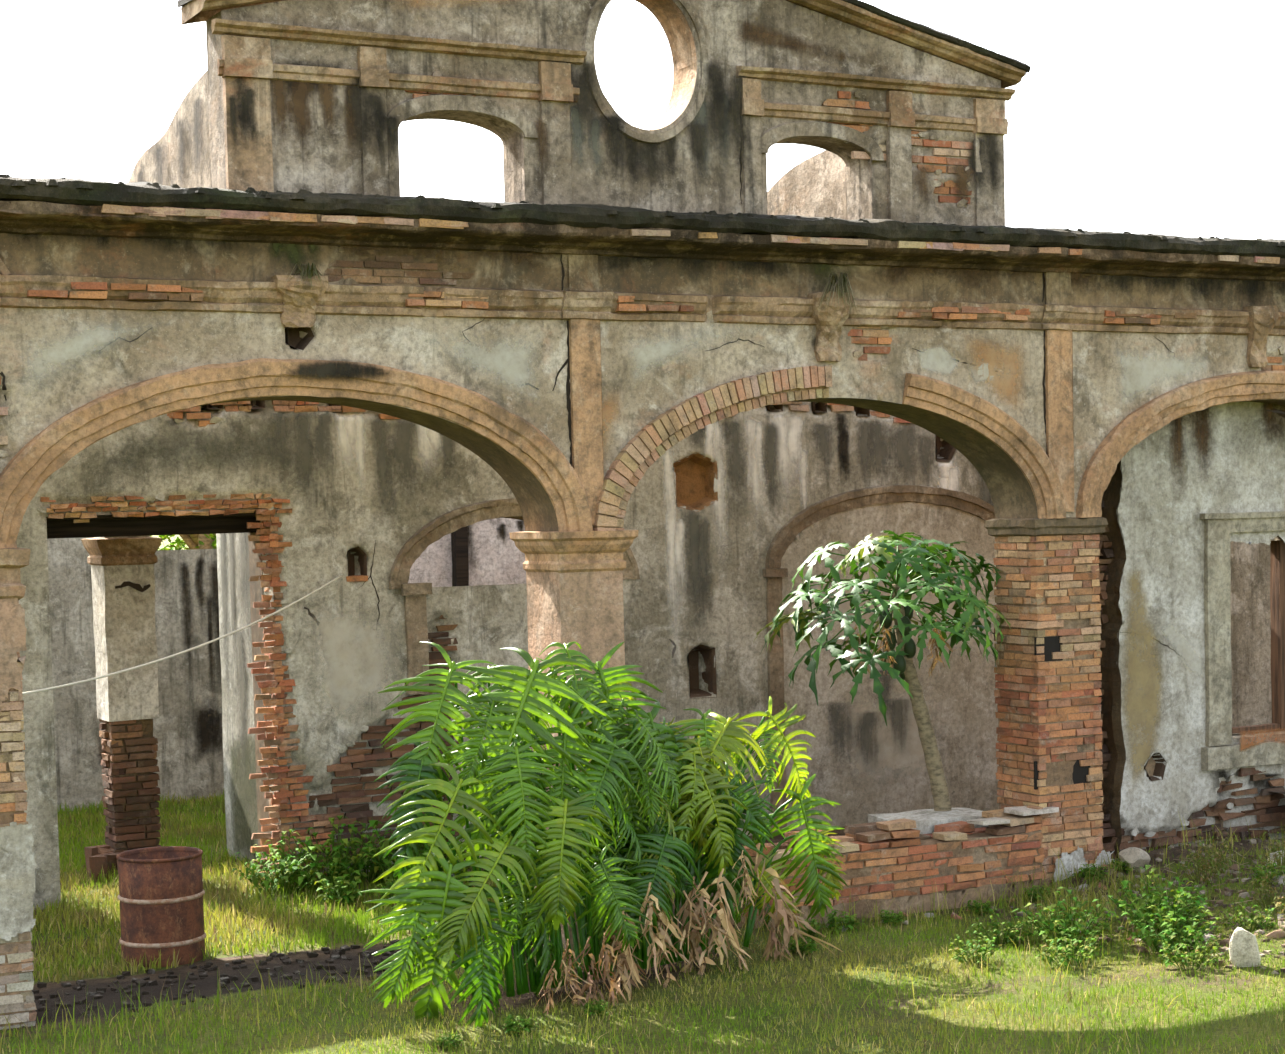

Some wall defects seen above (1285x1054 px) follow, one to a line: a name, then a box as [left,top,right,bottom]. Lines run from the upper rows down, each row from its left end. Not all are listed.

water stain [228,77,256,140]
water stain [270,78,398,150]
spalling [911,128,977,208]
crack [0,372,8,400]
spalling [167,401,252,426]
spalling [272,400,400,419]
water stain [1171,407,1210,467]
water stain [664,414,958,617]
water stain [181,533,251,737]
spalling [37,493,459,881]
spalling [1072,461,1285,859]
water stain [195,707,223,756]